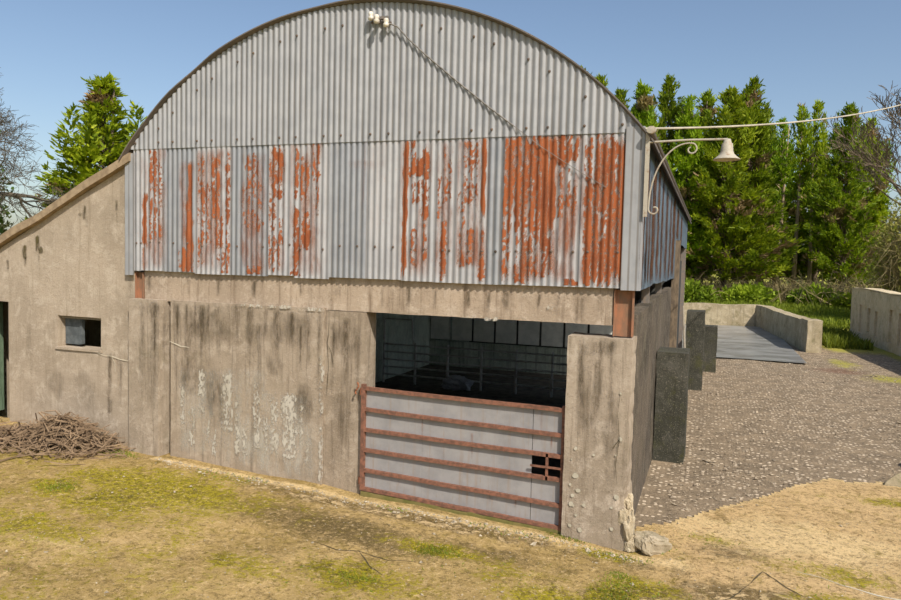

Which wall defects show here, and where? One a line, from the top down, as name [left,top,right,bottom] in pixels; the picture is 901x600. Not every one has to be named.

rust [142,149,164,269]
rust [178,143,321,276]
rust [401,138,487,281]
rust [501,133,626,287]